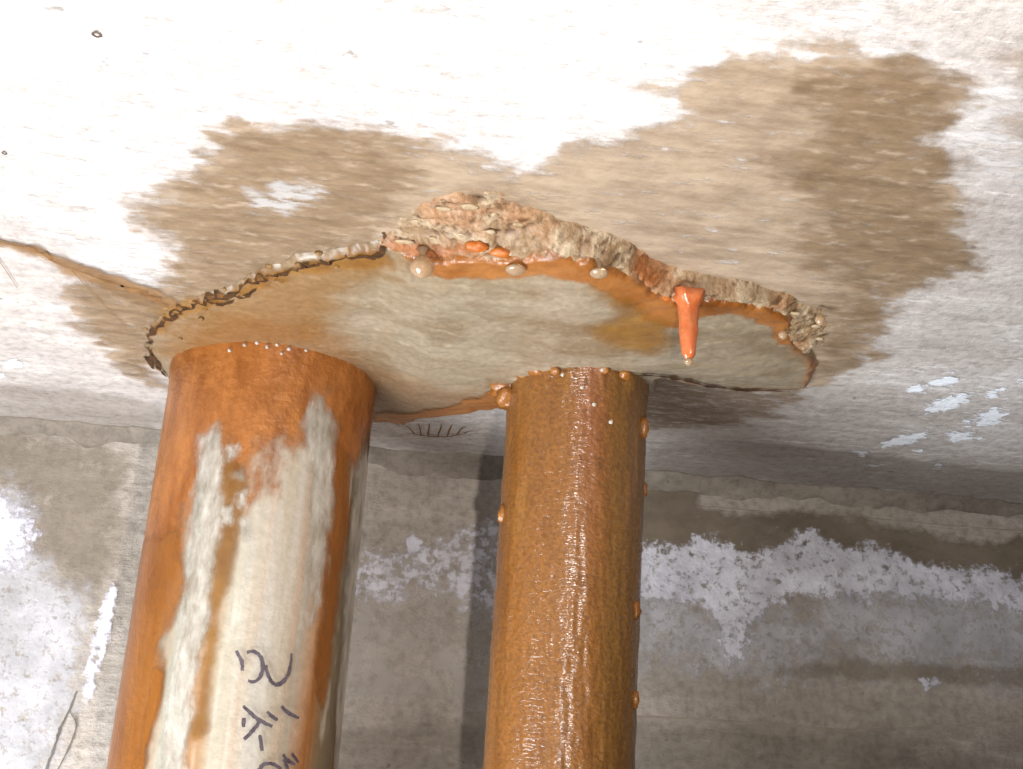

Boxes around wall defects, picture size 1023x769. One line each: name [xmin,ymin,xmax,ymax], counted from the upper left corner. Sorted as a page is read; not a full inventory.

crack [0,233,391,377]
damp [61,40,1023,428]
rust [430,252,679,351]
spalling [375,191,830,353]
rust [600,367,632,380]
rust [699,297,792,344]
efflorescence [0,489,117,769]
damp [639,490,1023,685]
damp [918,676,942,692]